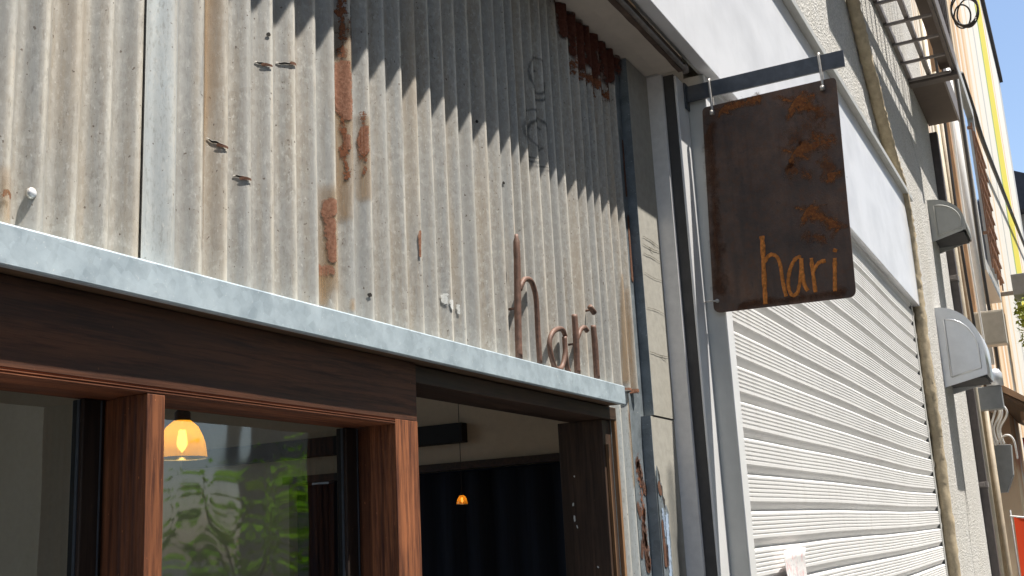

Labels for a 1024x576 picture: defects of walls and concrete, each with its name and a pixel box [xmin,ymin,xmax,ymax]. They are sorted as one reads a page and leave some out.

corrosion [319,0,370,302]
corrosion [553,0,622,102]